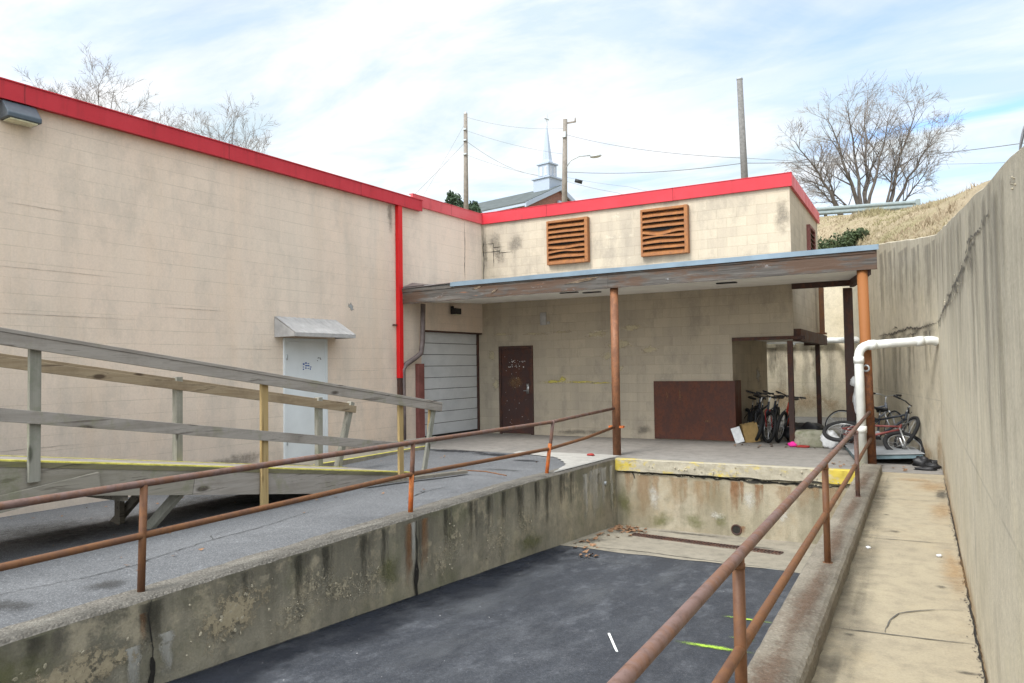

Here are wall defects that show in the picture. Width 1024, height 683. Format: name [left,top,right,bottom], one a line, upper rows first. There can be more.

crack [879,210,989,340]
water stain [470,473,572,521]
water stain [296,545,333,585]
water stain [361,528,389,553]
crack [407,519,426,595]
spalling [186,562,392,656]